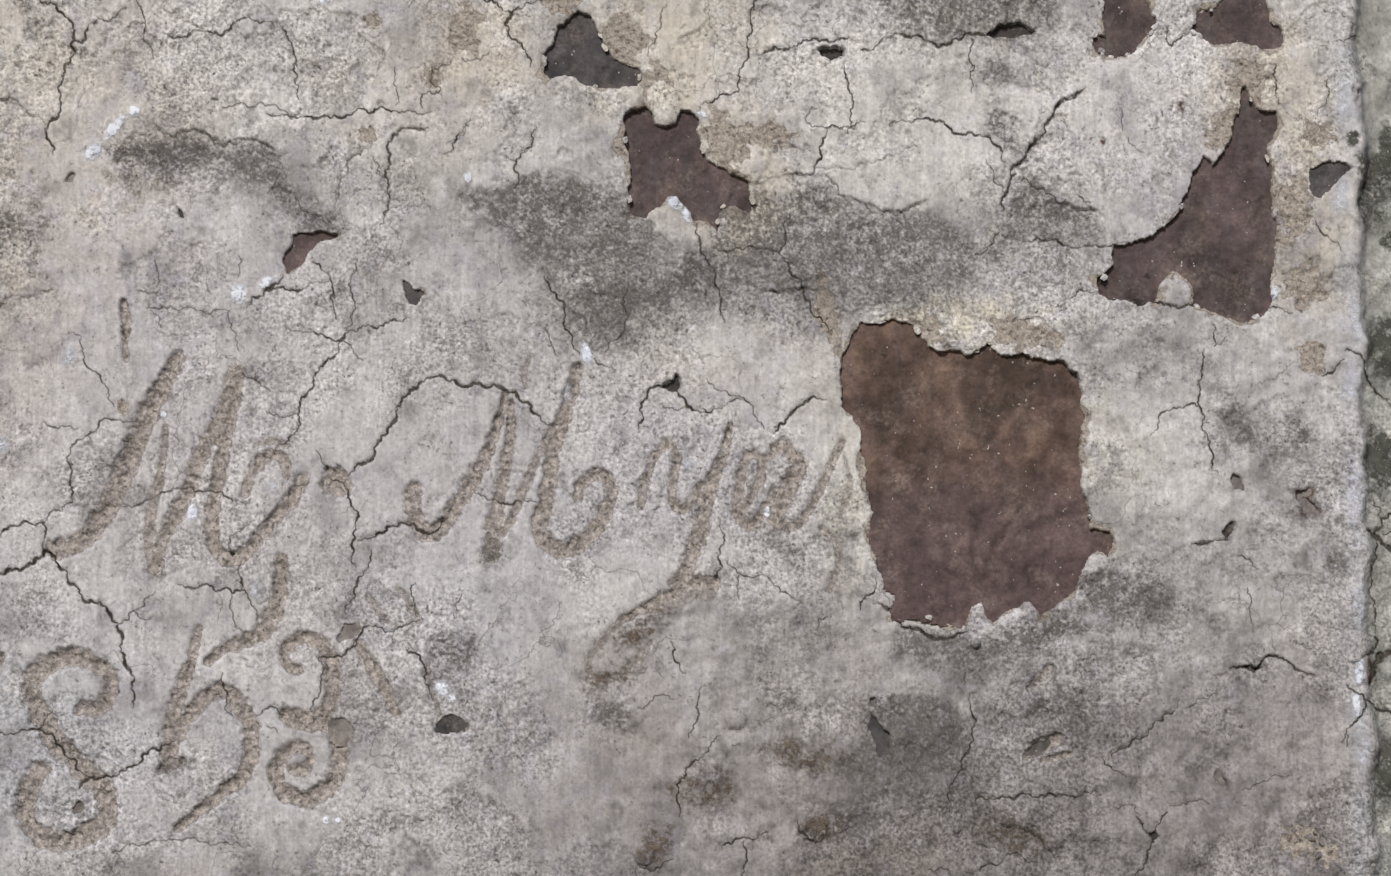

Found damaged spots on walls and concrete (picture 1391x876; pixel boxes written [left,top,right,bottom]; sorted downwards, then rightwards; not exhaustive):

crack [0,332,257,707]
crack [39,0,542,226]
spalling [282,232,341,274]
crack [138,255,551,731]
spalling [536,0,800,231]
crack [638,379,827,434]
crack [703,0,1130,255]
spalling [812,270,1116,631]
spalling [1088,0,1350,325]
peeling [1295,341,1326,375]
crack [1230,499,1391,747]
crack [0,709,176,788]